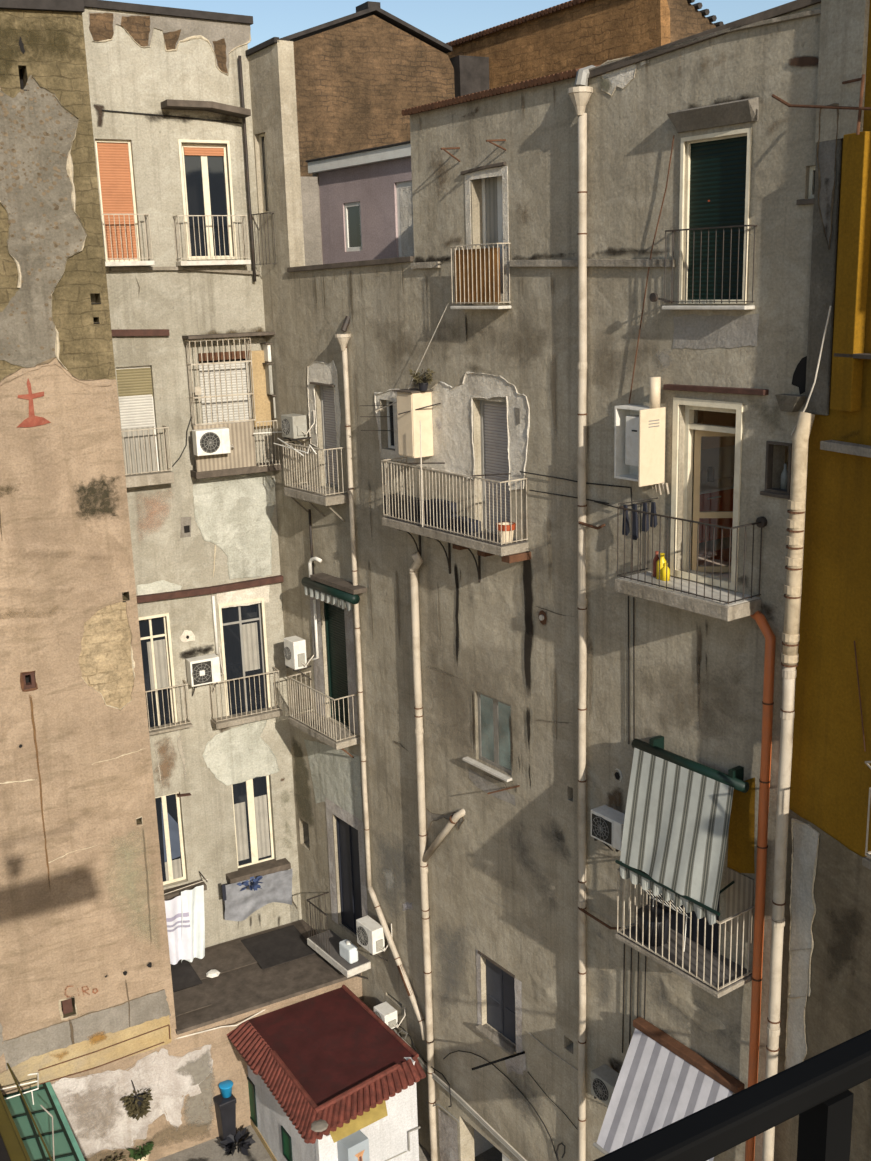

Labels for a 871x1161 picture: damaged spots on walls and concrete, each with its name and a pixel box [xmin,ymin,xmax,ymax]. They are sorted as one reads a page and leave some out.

spalling [0,10,251,387]
spalling [374,372,530,491]
damp [77,478,118,520]
peeling [137,580,182,595]
spalling [79,600,135,710]
damp [523,559,533,747]
damp [509,715,531,788]
peeling [51,1045,213,1158]